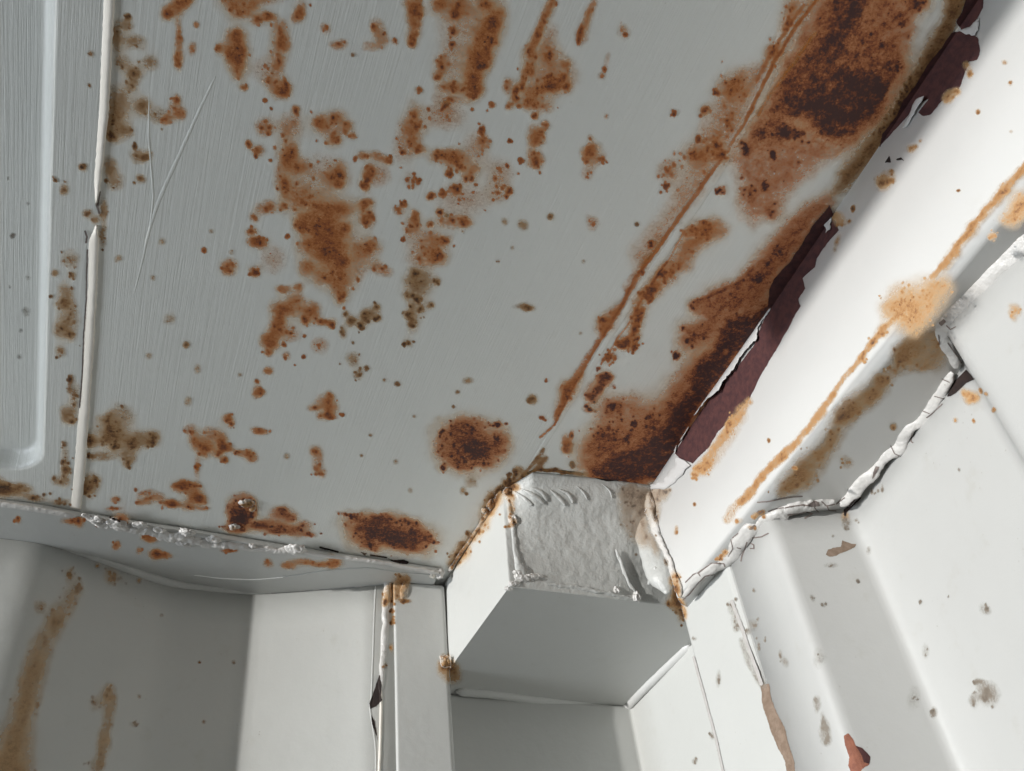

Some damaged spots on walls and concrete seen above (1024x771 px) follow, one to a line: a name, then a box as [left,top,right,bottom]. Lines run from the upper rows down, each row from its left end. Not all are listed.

peeling [879,0,983,147]
crack [79,191,101,408]
corrosion [87,405,160,470]
corrosion [134,413,257,510]
corrosion [218,493,323,538]
corrosion [214,0,573,399]
corrosion [338,0,965,570]
peeling [650,205,839,490]
crack [682,319,974,601]
corrosion [725,163,1024,530]
peeling [760,684,795,771]
peeling [844,733,869,771]